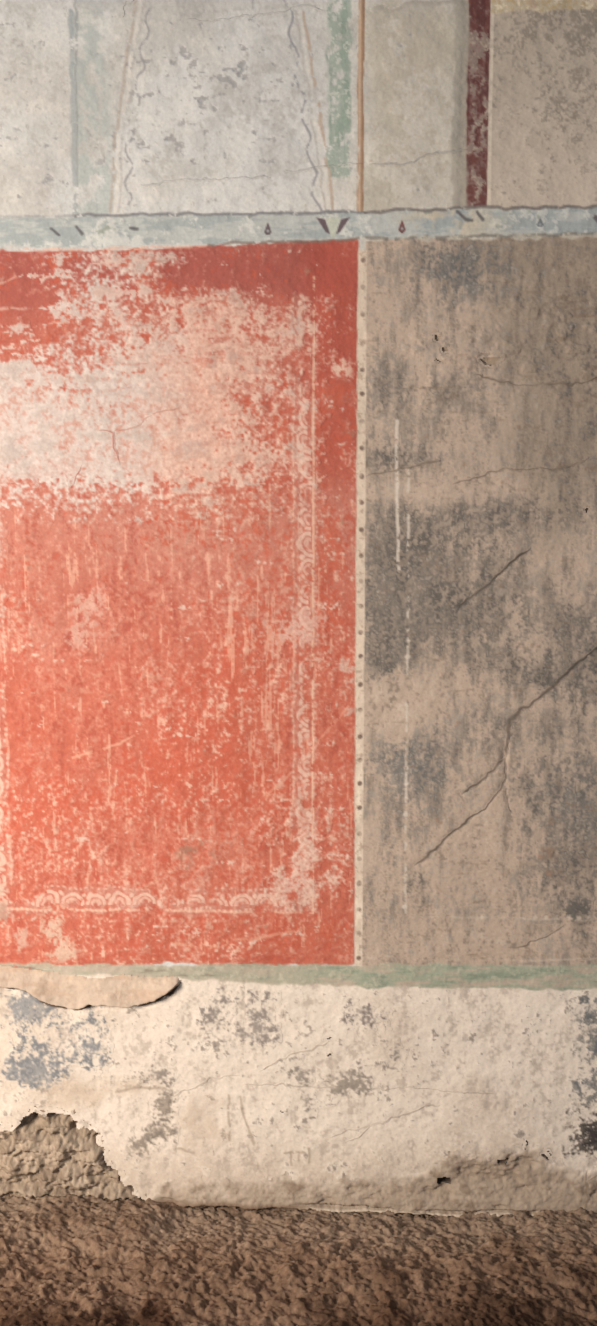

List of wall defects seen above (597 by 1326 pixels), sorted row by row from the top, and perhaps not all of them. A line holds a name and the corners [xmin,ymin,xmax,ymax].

peeling [0,247,357,628]
peeling [60,573,127,668]
peeling [247,606,331,675]
crack [455,548,530,613]
crack [413,646,597,866]
peeling [256,793,353,913]
leakage [559,992,597,1165]
spalling [0,1106,597,1217]